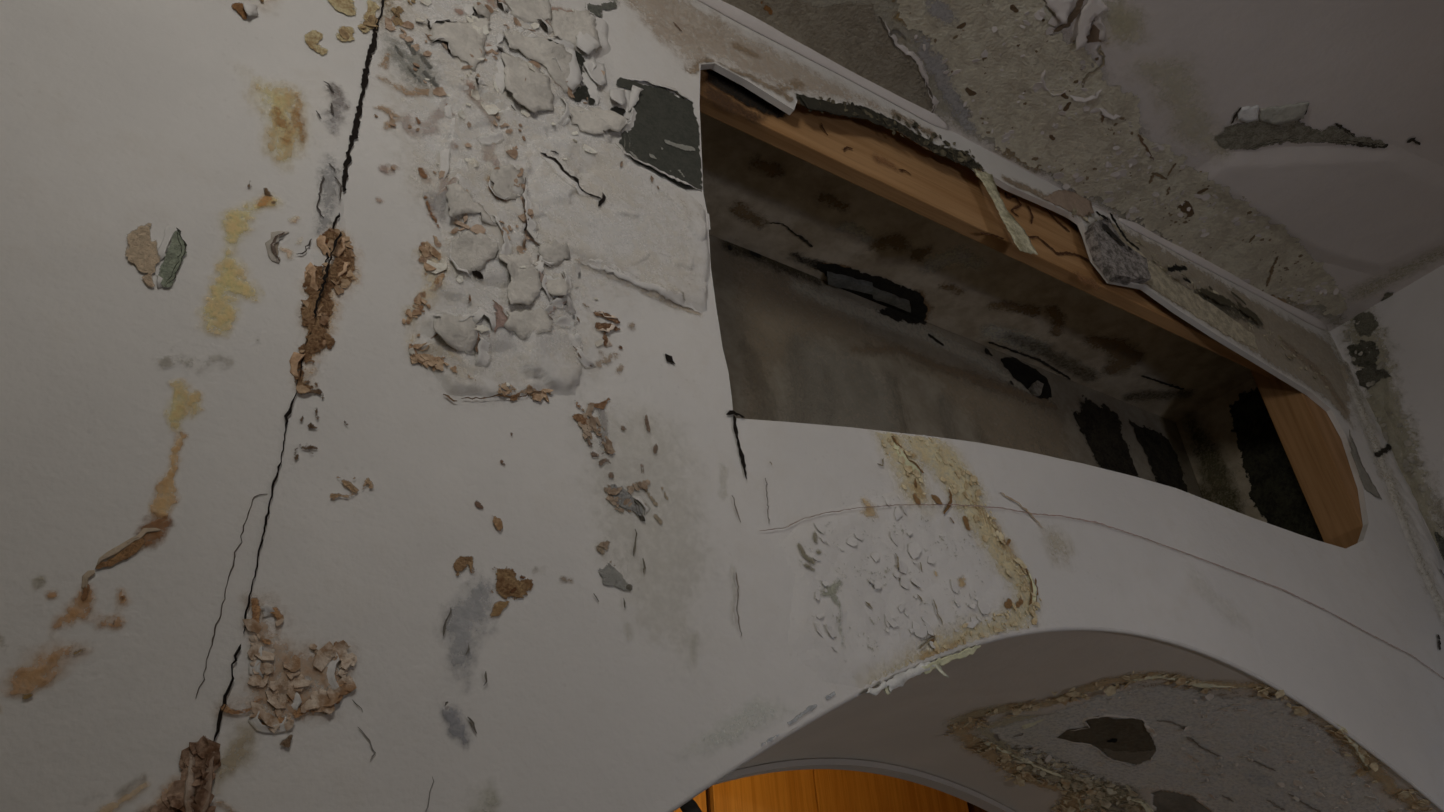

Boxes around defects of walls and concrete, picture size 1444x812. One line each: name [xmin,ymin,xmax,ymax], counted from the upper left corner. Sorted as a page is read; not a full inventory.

crack [318,0,384,291]
spalling [1215,102,1388,150]
spalling [125,223,187,289]
spalling [424,0,1347,523]
crack [196,332,311,741]
spalling [151,735,221,812]
spalling [1057,712,1156,767]